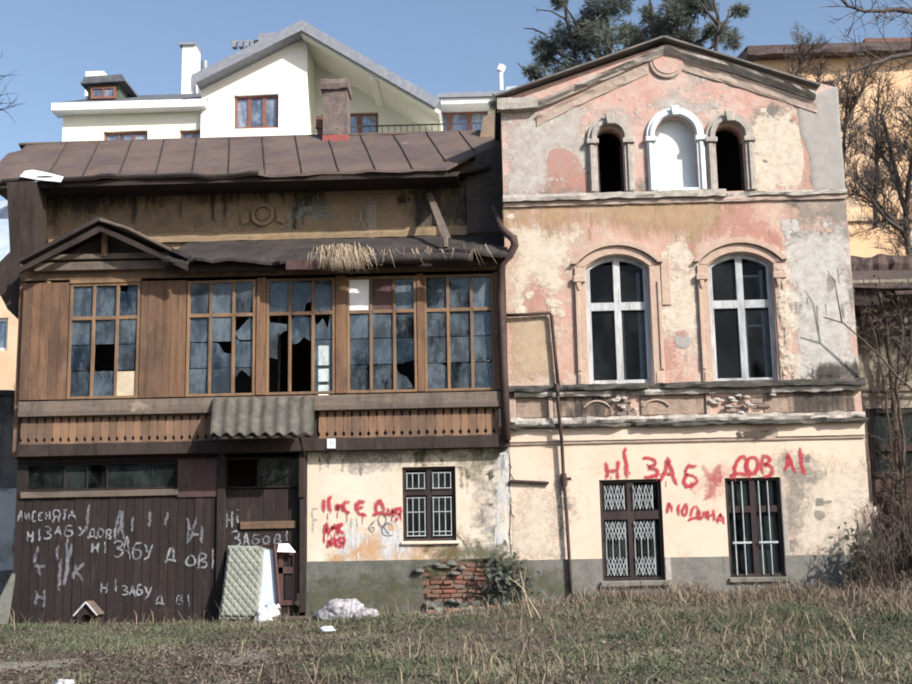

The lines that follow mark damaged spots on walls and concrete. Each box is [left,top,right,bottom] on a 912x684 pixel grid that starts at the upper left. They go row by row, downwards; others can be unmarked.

peeling [502,98,643,195]
peeling [504,207,589,319]
peeling [660,101,860,379]
peeling [486,470,564,564]
spalling [412,556,509,612]